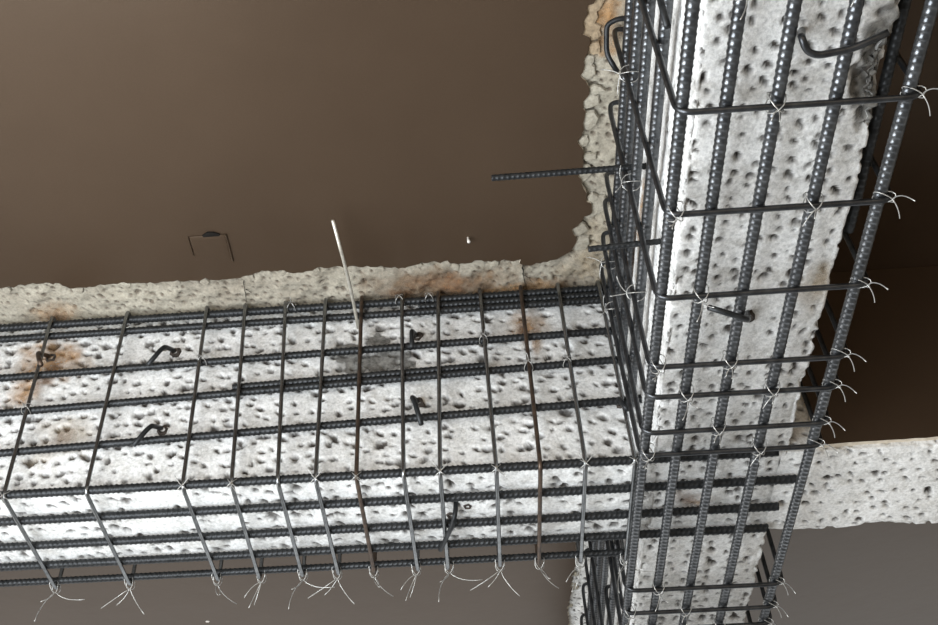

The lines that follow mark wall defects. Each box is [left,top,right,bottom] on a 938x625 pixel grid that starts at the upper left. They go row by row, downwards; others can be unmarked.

spalling [850,4,900,121]
rust [391,270,540,296]
rust [15,346,72,401]
spalling [332,329,416,374]
spalling [568,541,590,625]